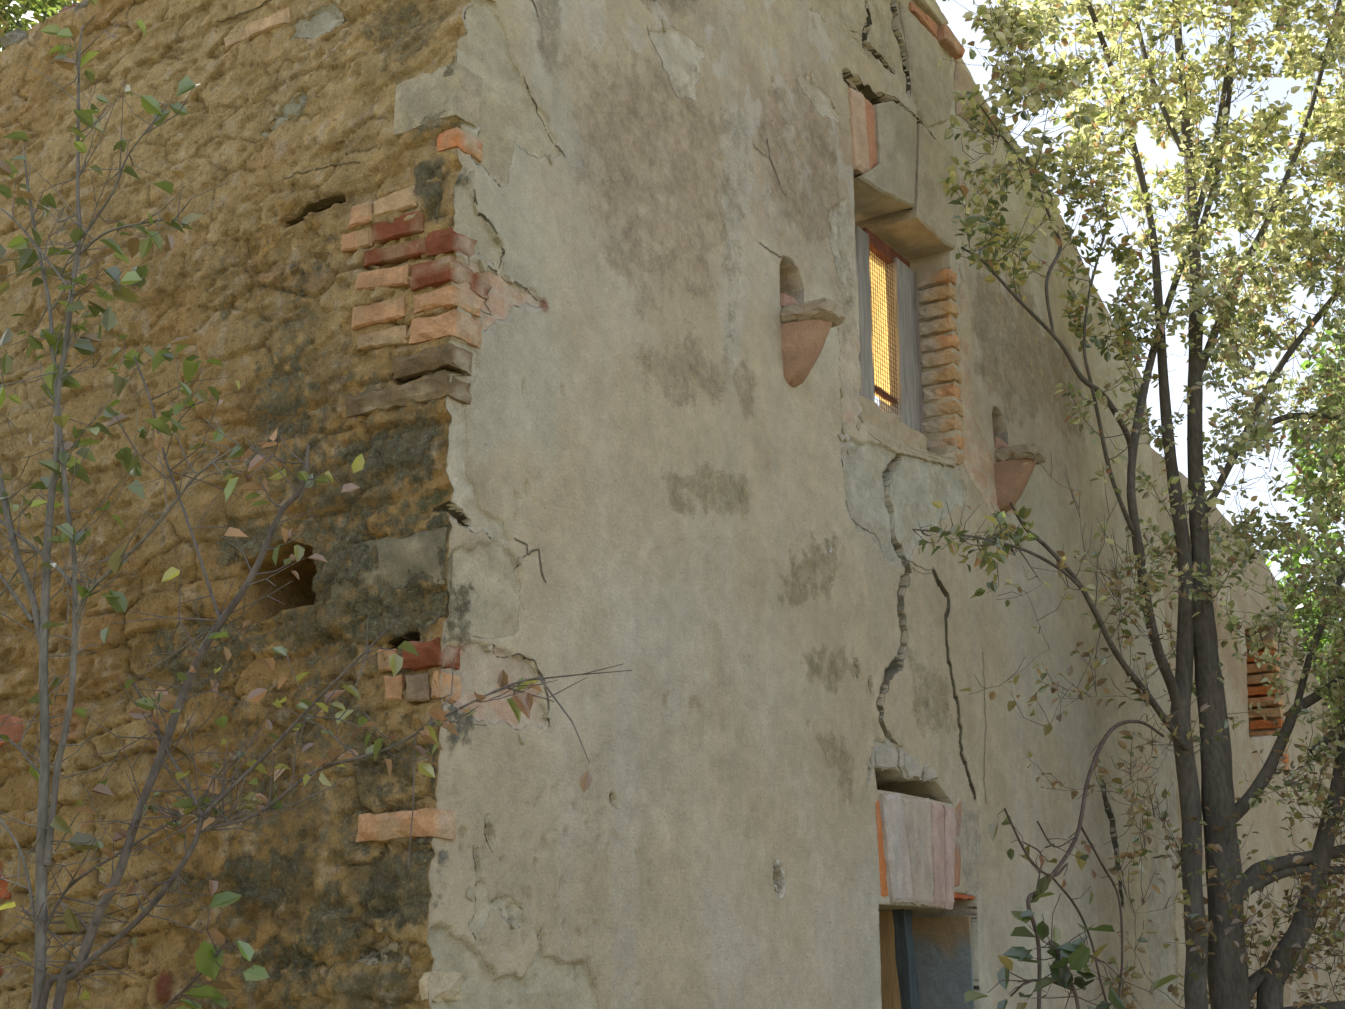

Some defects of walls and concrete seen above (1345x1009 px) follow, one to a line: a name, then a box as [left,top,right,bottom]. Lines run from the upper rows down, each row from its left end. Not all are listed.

spalling [451,0,560,331]
crack [843,1,935,139]
spalling [448,340,480,384]
spalling [433,396,552,745]
crack [846,444,987,802]